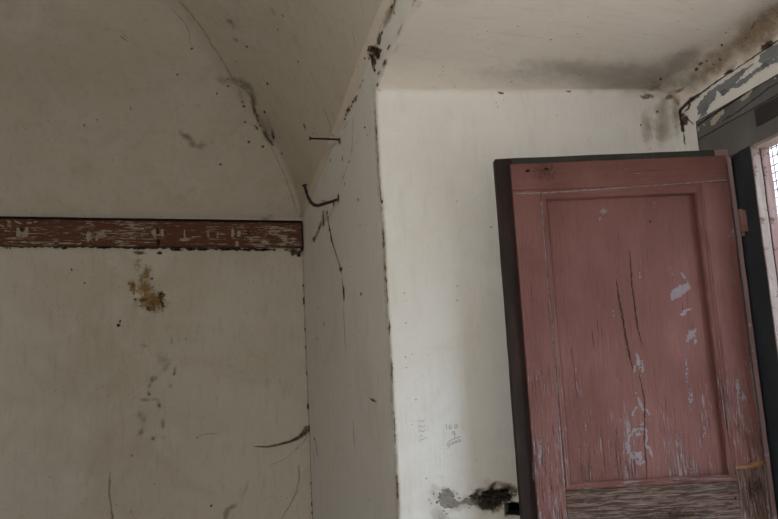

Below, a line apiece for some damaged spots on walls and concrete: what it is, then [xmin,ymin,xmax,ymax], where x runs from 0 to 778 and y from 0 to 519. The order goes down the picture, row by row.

water stain [694,8,778,73]
peeling [681,44,778,132]
rust [128,260,166,313]
flaking render [53,247,275,255]
crack [326,215,345,299]
spalling [429,483,520,515]